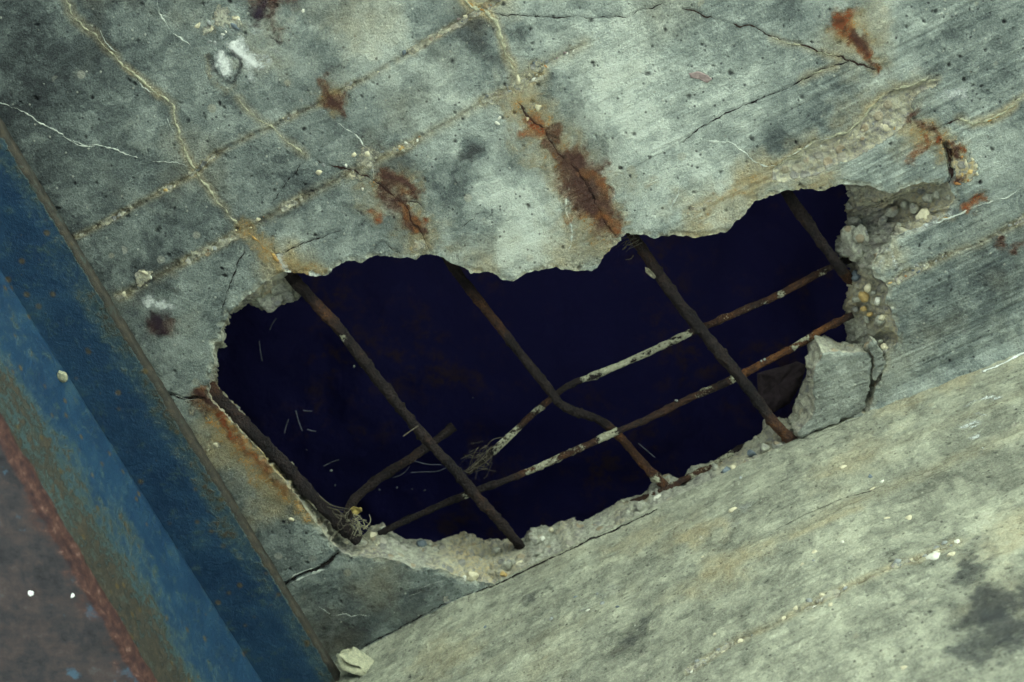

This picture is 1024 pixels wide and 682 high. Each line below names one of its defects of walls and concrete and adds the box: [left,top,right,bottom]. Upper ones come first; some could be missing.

crack [0,0,365,313]
corrosion [317,78,346,117]
corrosion [362,168,428,242]
corrosion [505,93,626,249]
crack [464,0,938,167]
corrosion [832,9,881,73]
corrosion [905,110,967,162]
corrosion [148,311,173,337]
spalling [208,79,979,584]
corrosion [191,387,314,523]
crack [366,509,657,646]
water stain [945,536,1024,665]